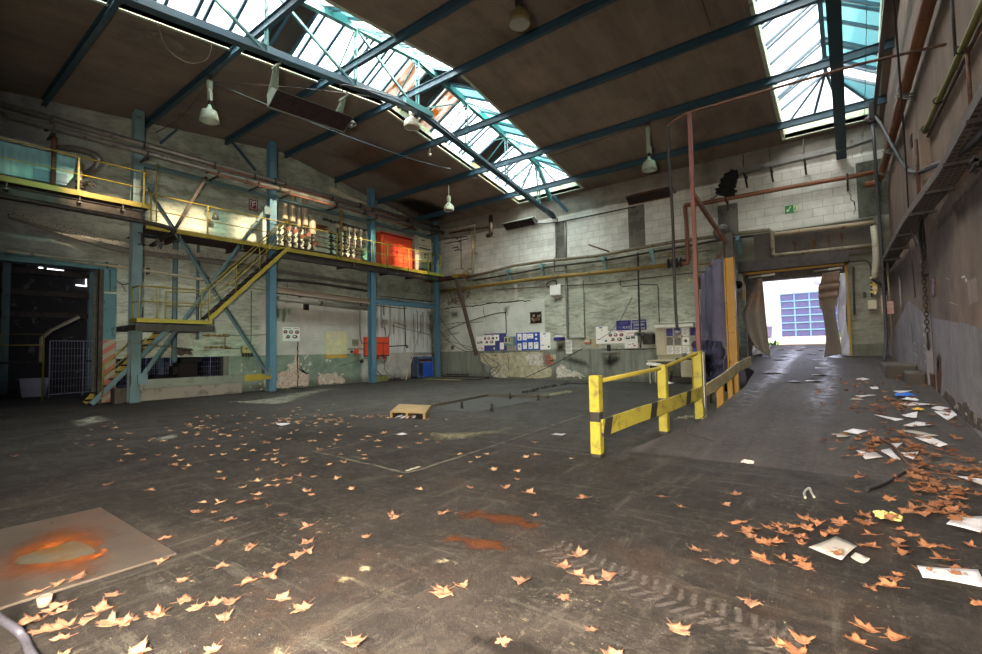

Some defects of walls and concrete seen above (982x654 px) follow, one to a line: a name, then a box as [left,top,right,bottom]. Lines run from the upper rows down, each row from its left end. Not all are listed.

spalling [250,331,347,390]
spalling [479,351,585,379]
rust [14,531,105,570]